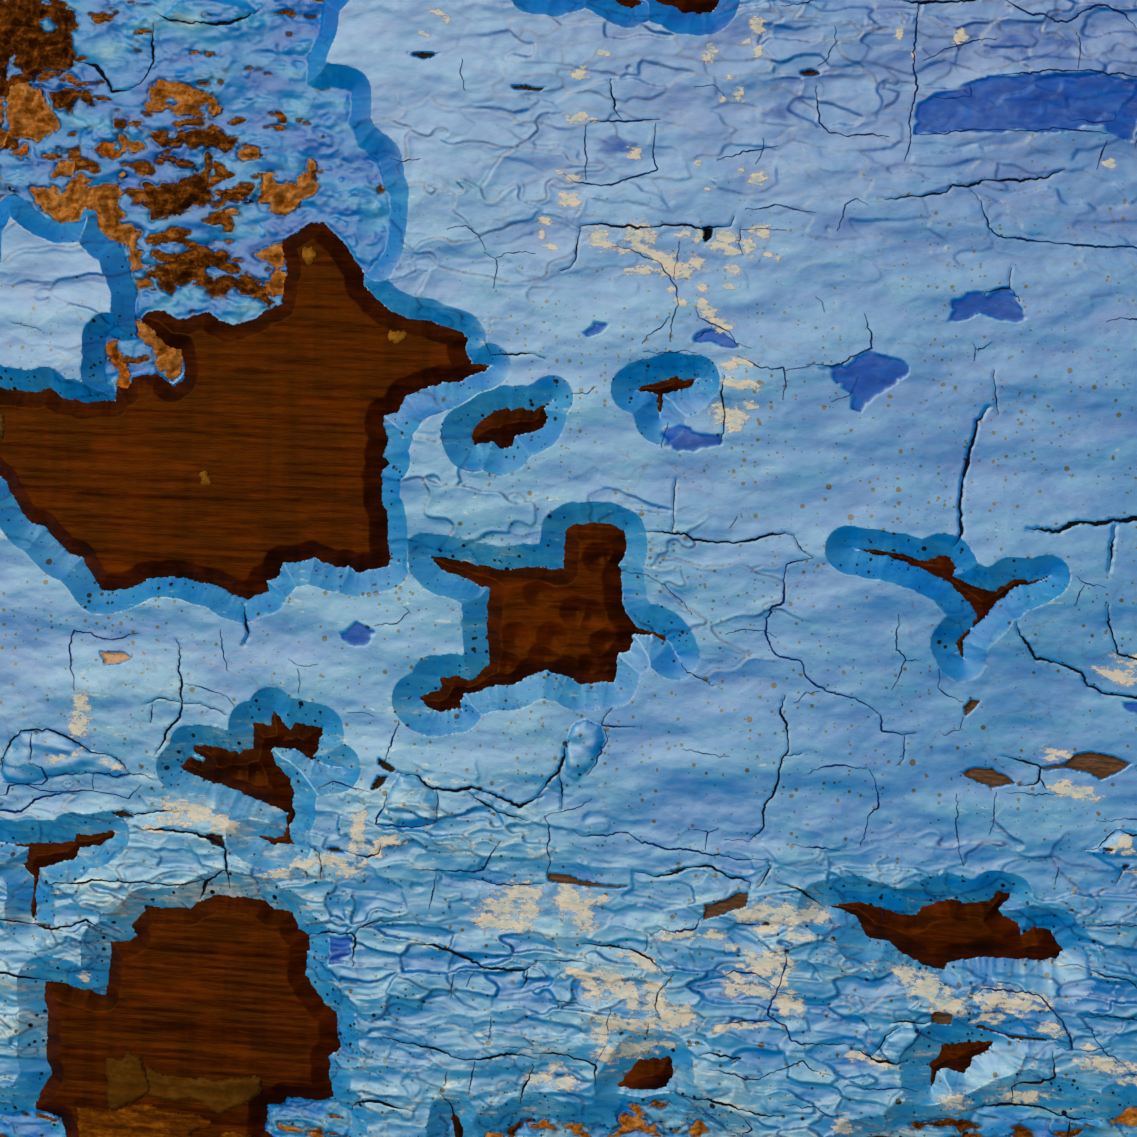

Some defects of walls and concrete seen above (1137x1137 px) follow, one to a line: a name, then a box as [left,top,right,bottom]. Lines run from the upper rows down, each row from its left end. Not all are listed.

leakage [587,219,782,333]
crack [560,204,872,443]
peeling [0,159,700,737]
peeling [825,526,1070,682]
crack [1030,516,1137,660]
crack [0,606,249,898]
crack [318,480,964,908]
peeling [0,687,361,1137]
leakage [469,880,609,933]
leakage [563,898,838,1064]
peeling [798,870,1099,1005]
leakage [892,966,1067,1038]